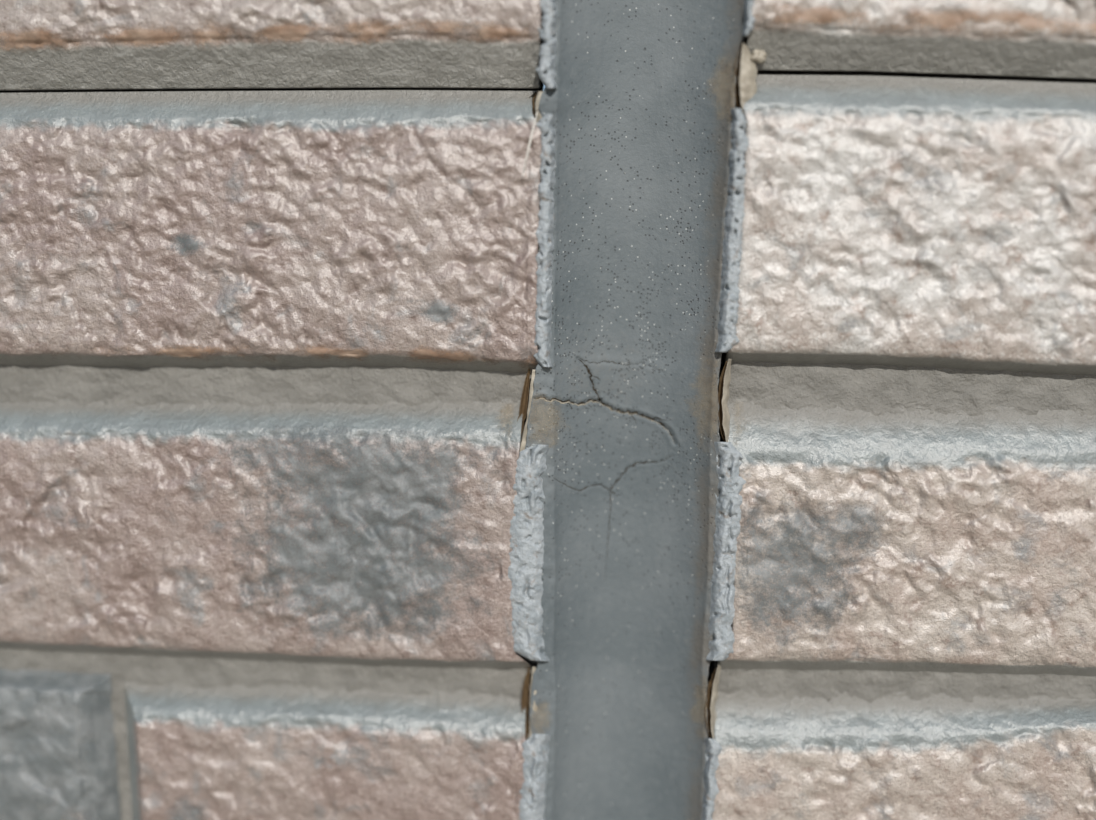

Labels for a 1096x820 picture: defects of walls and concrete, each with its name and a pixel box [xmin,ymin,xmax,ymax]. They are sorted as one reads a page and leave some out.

peeling [734,41,768,115]
peeling [517,369,536,451]
peeling [717,359,732,442]
crack [533,359,676,577]
peeling [521,667,538,741]